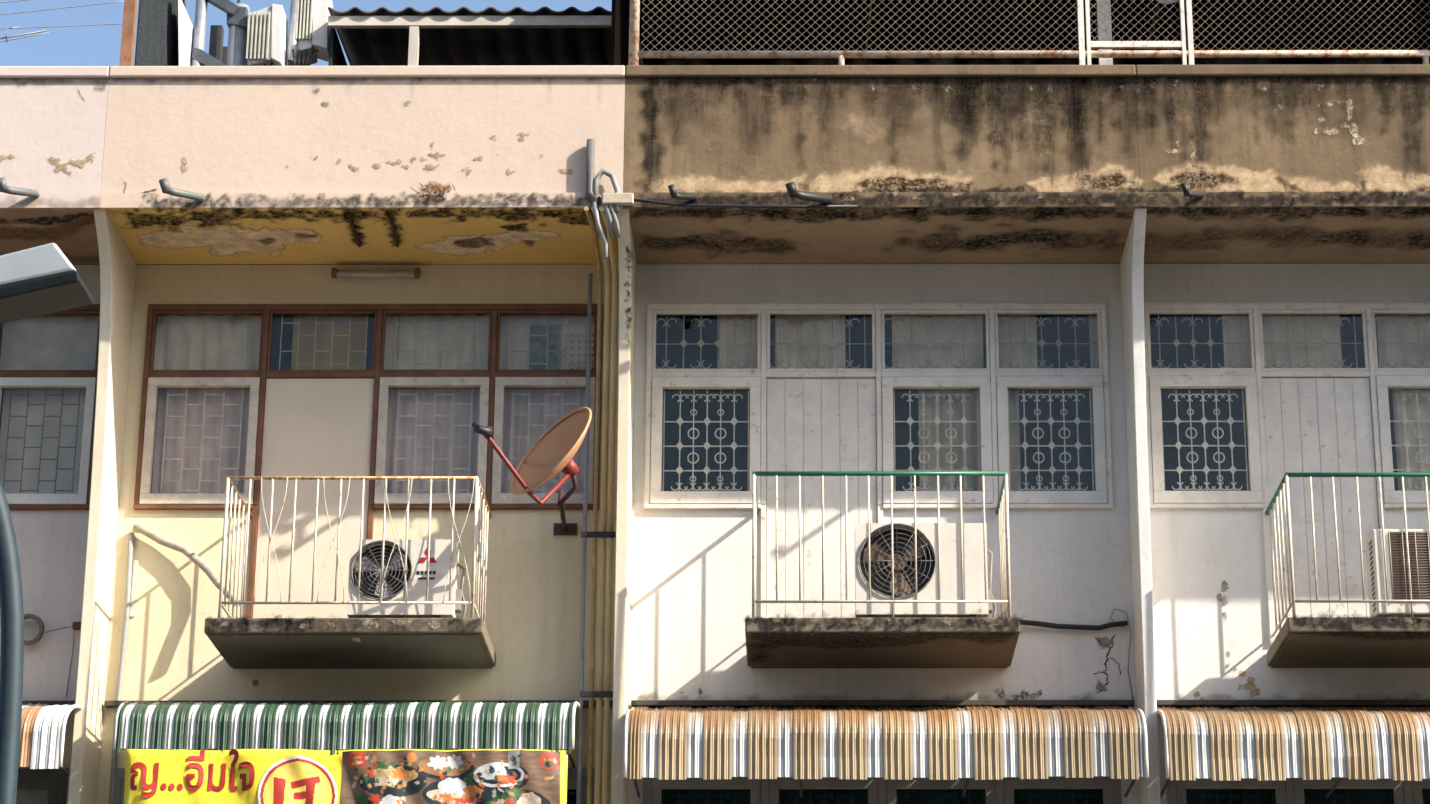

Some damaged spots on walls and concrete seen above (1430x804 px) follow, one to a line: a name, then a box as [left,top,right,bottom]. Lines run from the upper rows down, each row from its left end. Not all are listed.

peeling [1315,85,1364,145]
peeling [48,152,95,174]
peeling [337,142,446,172]
damp [633,76,1430,254]
damp [0,215,94,240]
damp [125,193,611,229]